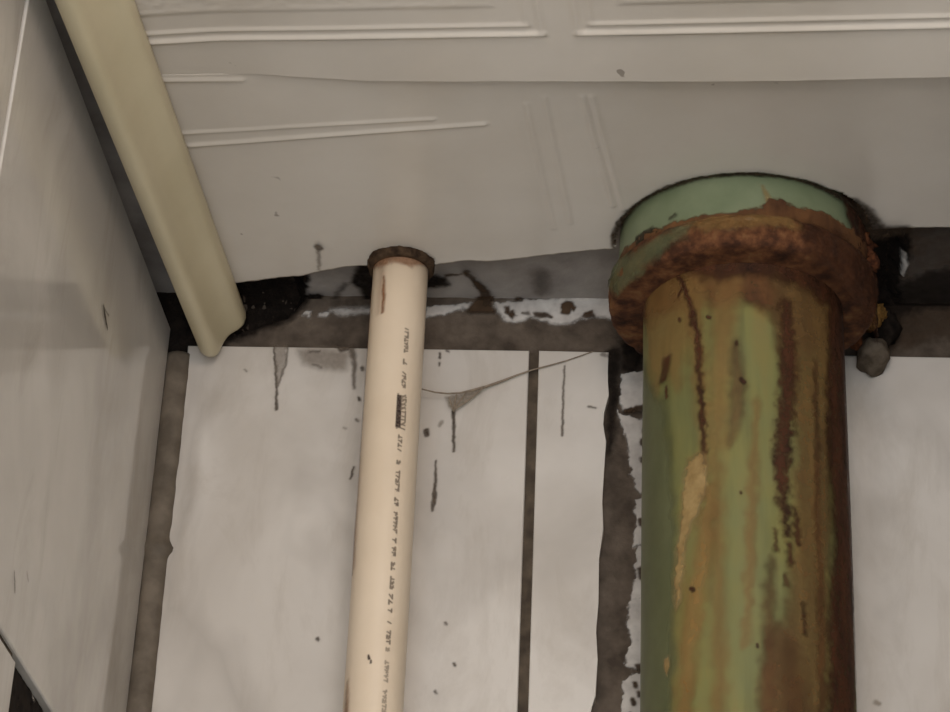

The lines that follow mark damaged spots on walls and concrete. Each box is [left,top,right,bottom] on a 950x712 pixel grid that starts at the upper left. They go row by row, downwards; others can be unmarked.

rust [617,193,880,273]
damp [157,292,198,354]
damp [351,266,373,299]
damp [427,270,595,319]
damp [336,346,363,385]
damp [606,342,643,453]
rust [642,262,856,712]
damp [630,664,640,706]